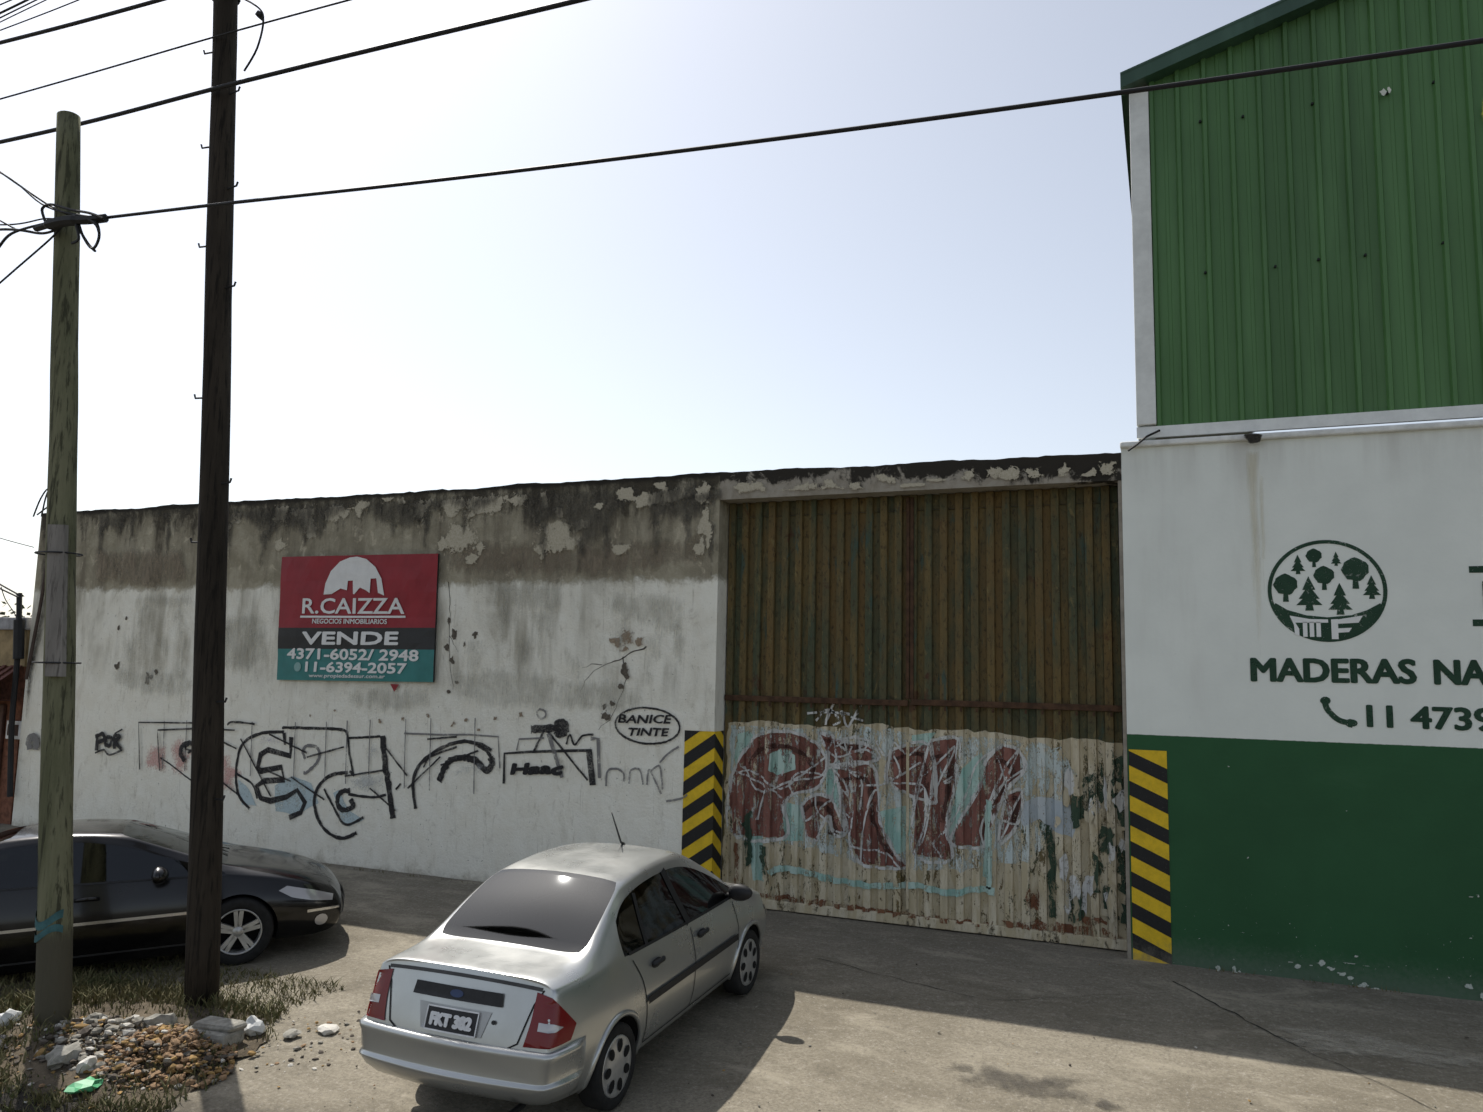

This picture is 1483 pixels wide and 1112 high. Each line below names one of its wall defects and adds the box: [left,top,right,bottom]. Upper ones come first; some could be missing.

peeling [734,461,1117,494]
peeling [272,481,713,564]
water stain [451,486,721,575]
peeling [1037,756,1127,924]
rust [760,892,1123,939]
peeling [1291,955,1379,989]